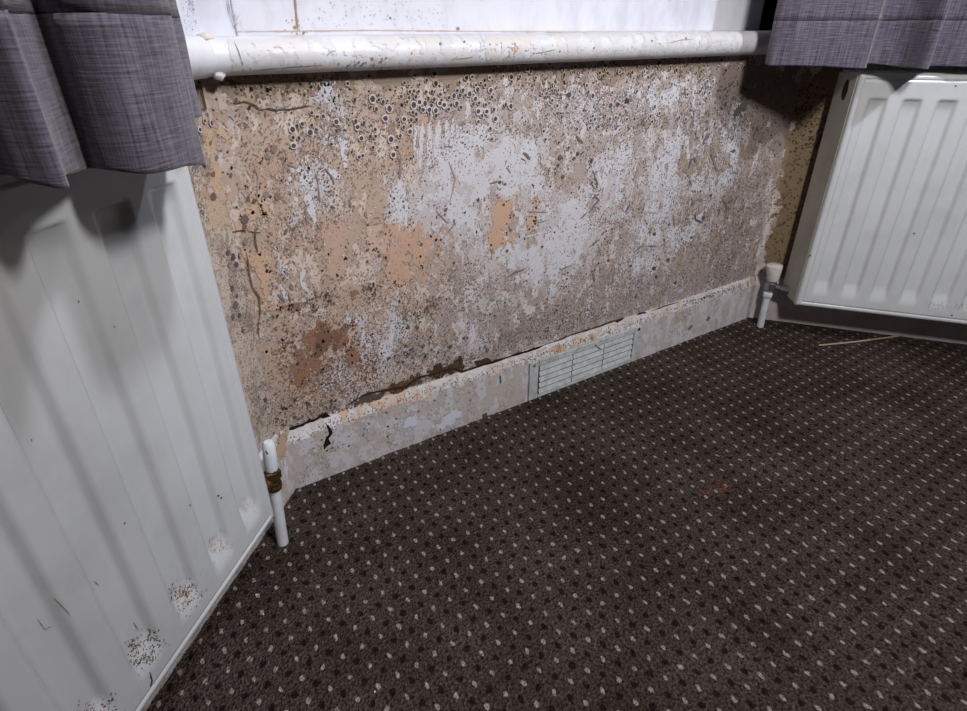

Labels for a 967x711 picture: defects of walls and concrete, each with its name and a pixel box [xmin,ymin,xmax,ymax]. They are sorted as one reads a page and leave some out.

crack [285,412,333,449]
crack [350,301,681,404]
leakage [188,0,854,507]
peeling [313,75,757,418]